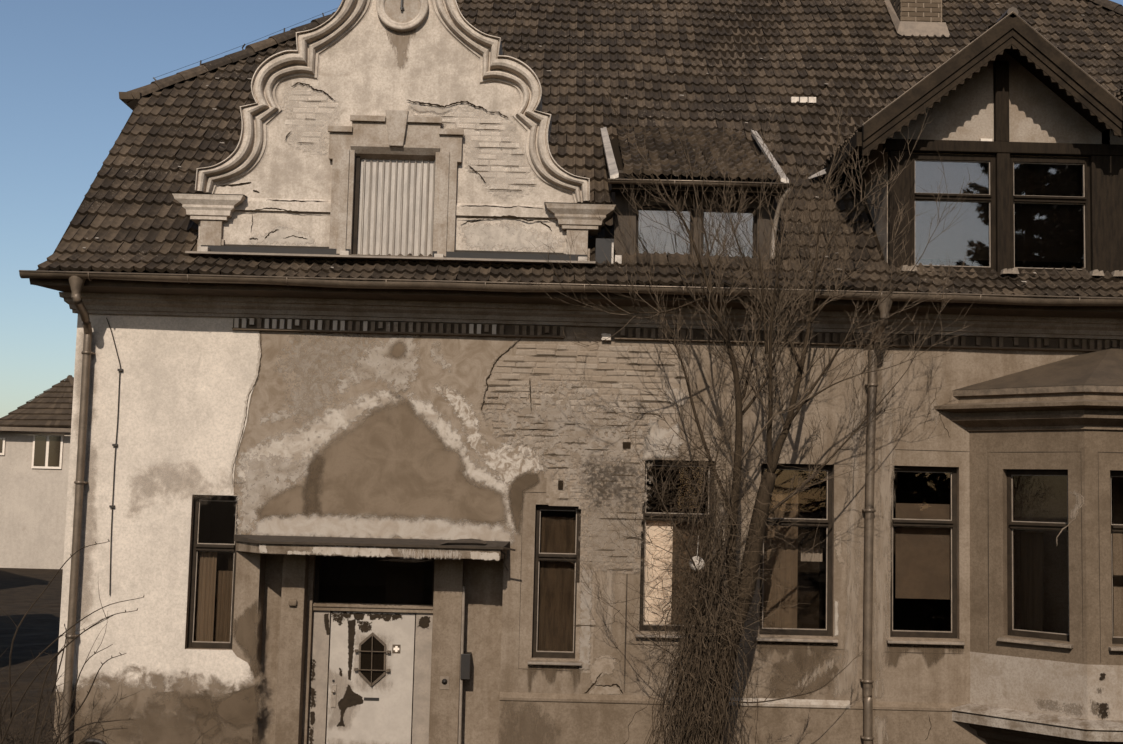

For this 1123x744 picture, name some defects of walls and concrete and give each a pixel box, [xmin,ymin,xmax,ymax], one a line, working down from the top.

damp [386,28,416,68]
flaking render [282,81,340,155]
flaking render [408,103,536,199]
flaking render [229,331,689,695]
peeling [308,658,317,744]